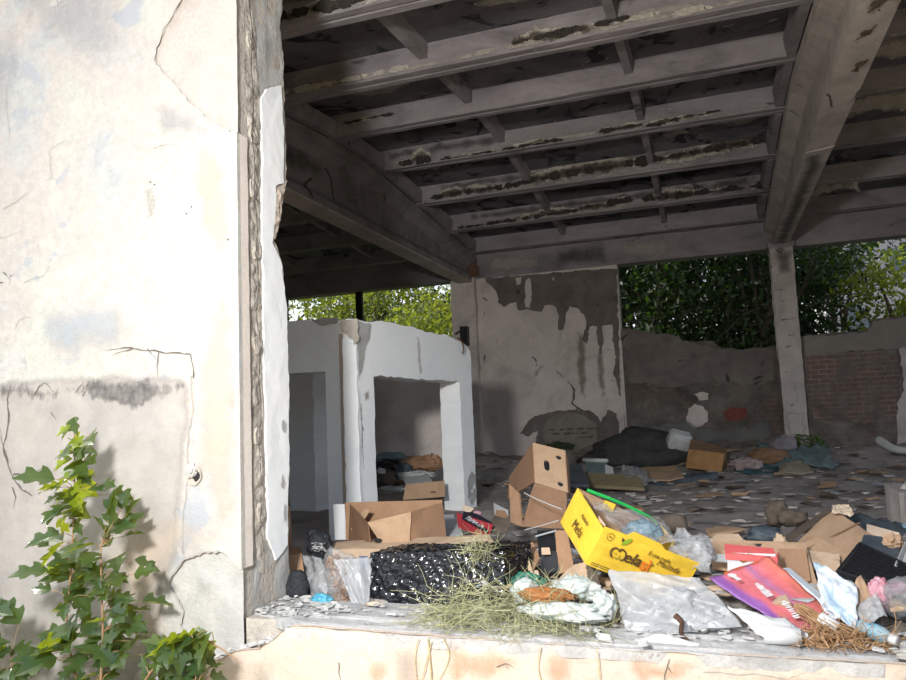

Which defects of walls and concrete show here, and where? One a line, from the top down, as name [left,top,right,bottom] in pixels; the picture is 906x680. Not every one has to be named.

spalling [459,1,739,59]
spalling [851,32,906,72]
spalling [848,86,906,116]
spalling [391,109,730,167]
spalling [431,135,766,200]
spalling [458,181,771,229]
peeling [468,262,775,428]
water stain [89,380,157,405]
crack [531,356,598,421]
peeling [804,318,906,444]